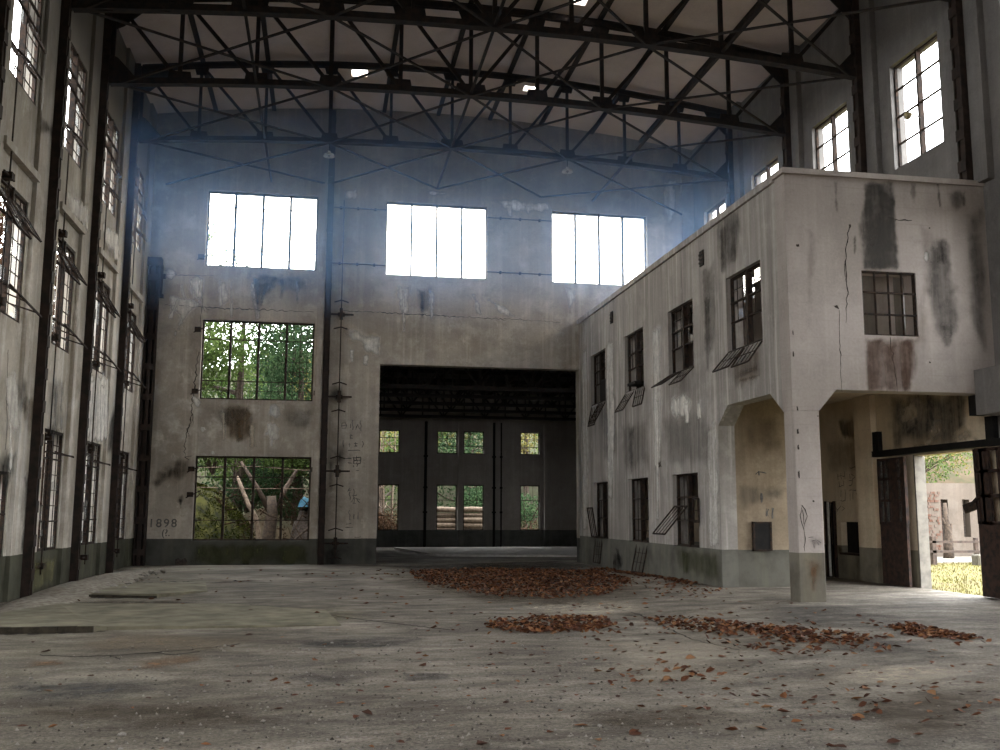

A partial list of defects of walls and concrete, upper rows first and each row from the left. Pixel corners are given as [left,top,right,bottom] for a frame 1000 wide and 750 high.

leakage [854,183,897,269]
leakage [252,275,305,318]
crack [839,227,850,388]
leakage [925,247,956,338]
crack [184,354,199,460]